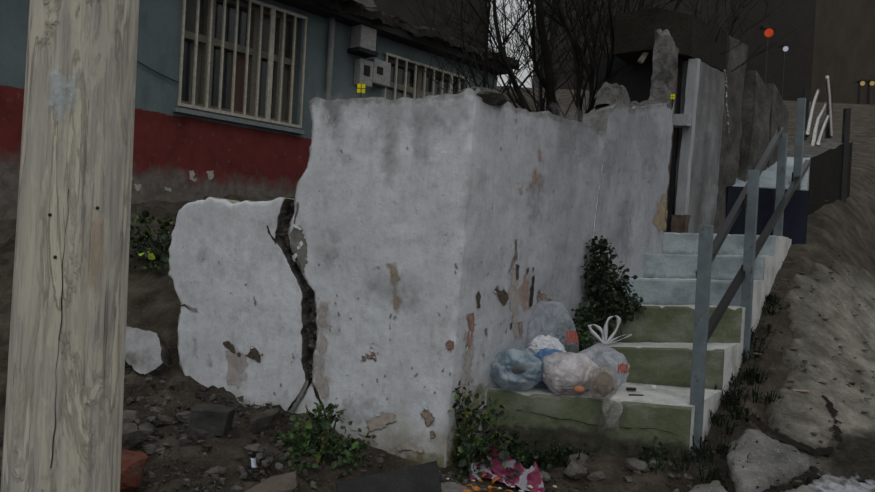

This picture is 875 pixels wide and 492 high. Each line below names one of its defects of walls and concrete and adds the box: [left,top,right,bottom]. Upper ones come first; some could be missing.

peeling [290,202,320,273]
crack [266,202,337,419]
peeling [466,291,488,352]
peeling [494,239,523,338]
spalling [223,341,263,388]
spalling [361,347,379,362]
spalling [366,411,396,442]
spalling [420,407,436,442]
crack [716,454,736,492]
crack [746,395,843,492]